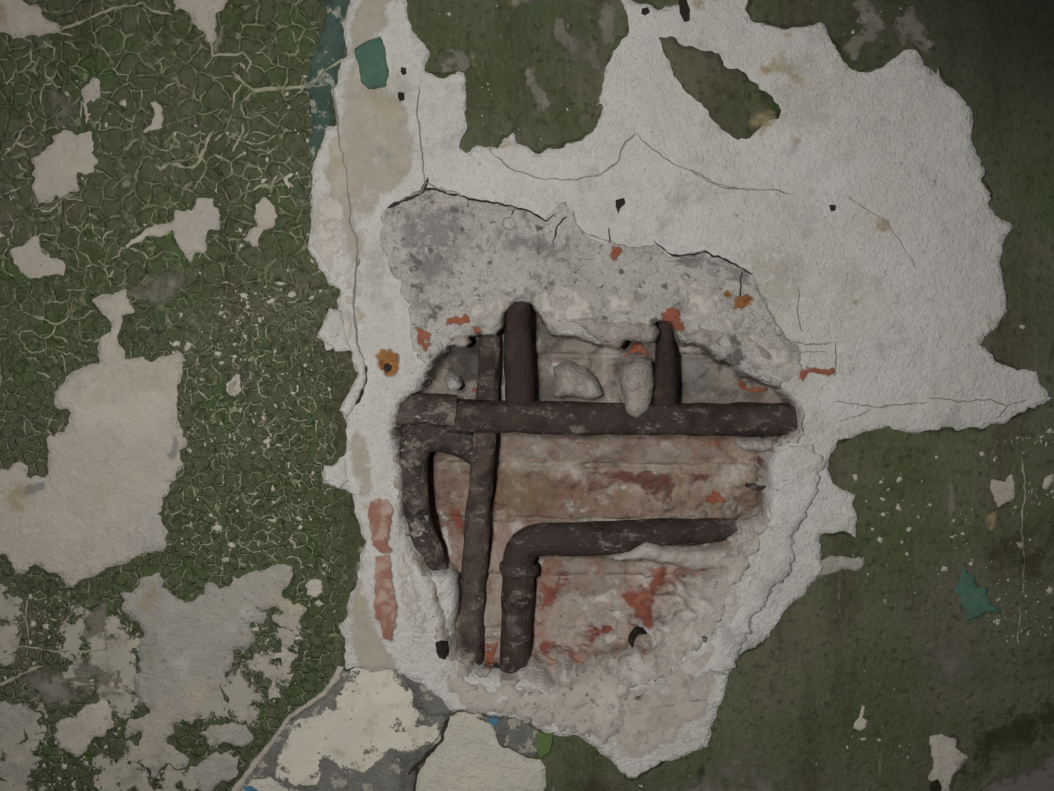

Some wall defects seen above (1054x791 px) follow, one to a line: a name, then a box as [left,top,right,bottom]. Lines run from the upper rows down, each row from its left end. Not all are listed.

peeling [0,0,60,39]
peeling [169,0,237,44]
peeling [28,73,127,203]
peeling [0,228,71,285]
peeling [124,189,224,274]
crack [387,86,836,368]
crack [846,196,916,269]
peeling [0,289,194,602]
crack [0,0,367,702]
peeling [238,0,1054,791]
crack [839,398,1026,421]
peeling [0,559,326,791]